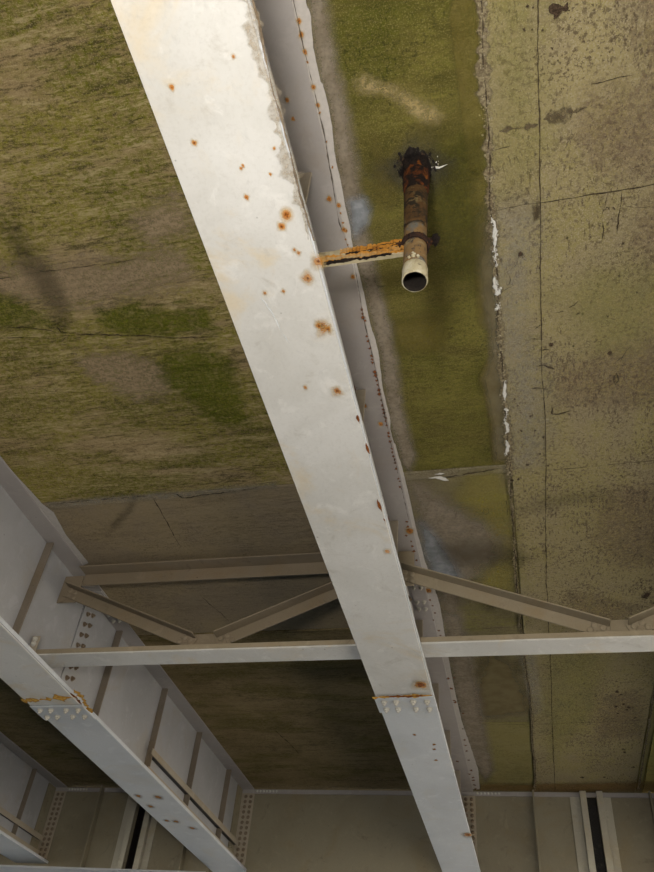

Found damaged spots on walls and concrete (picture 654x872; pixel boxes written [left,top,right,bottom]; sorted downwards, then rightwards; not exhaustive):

rust [278,210,291,230]
rust [314,196,404,266]
damp [451,0,510,464]
rust [316,322,330,333]
rust [21,690,93,713]
rust [372,682,432,699]